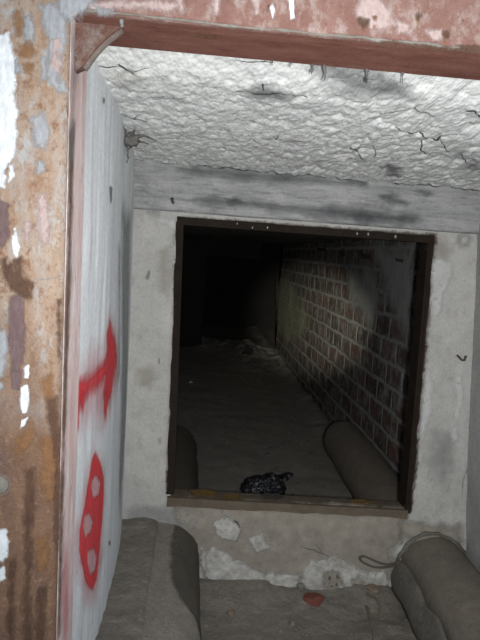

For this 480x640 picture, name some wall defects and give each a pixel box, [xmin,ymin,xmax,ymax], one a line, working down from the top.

corrosion [14,12,24,33]
corrosion [19,41,34,71]
crack [98,64,148,76]
crack [237,83,308,98]
peeling [355,0,412,35]
peeling [426,29,445,40]
crack [385,104,471,165]
corrosion [0,201,10,248]
corrosion [2,258,33,389]
corrosion [43,124,75,634]
corrosion [24,471,47,640]
flaking render [173,507,405,590]